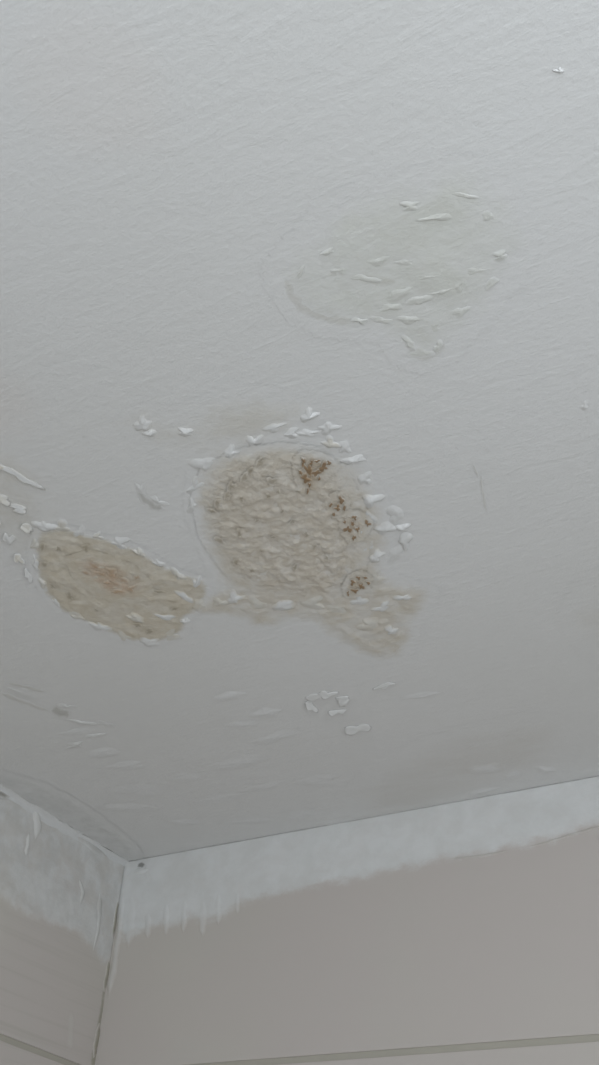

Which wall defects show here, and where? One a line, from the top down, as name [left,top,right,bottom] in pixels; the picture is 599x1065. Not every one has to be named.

water stain [0,381,441,666]